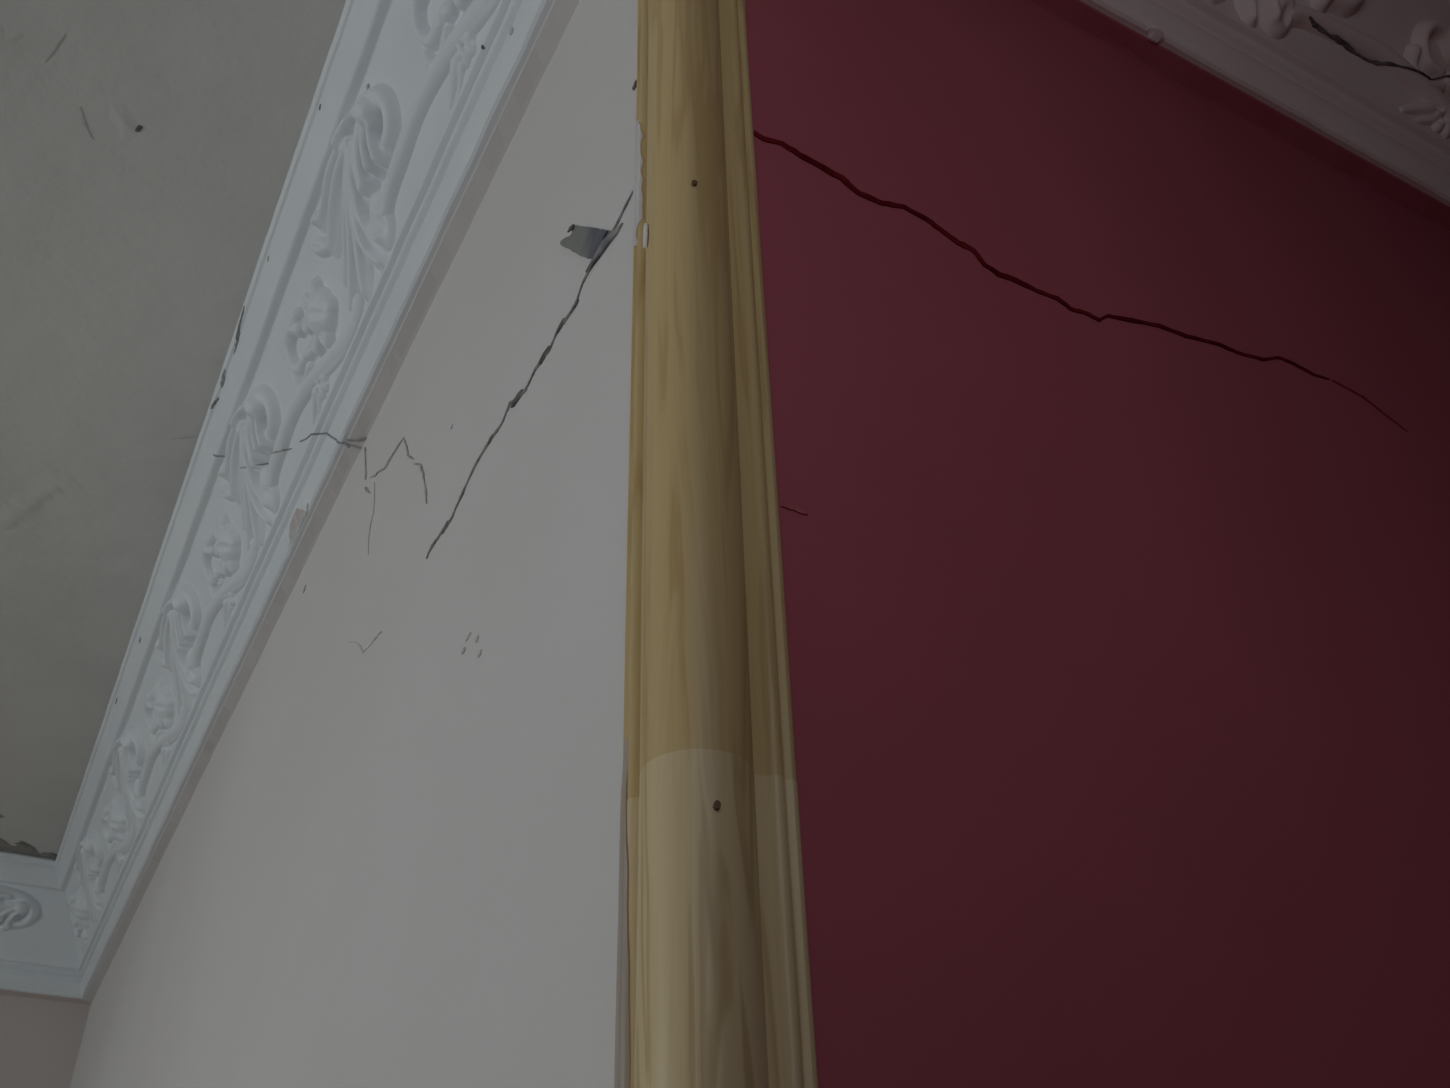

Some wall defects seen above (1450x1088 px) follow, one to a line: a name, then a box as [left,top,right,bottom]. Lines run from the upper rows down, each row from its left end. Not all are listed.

crack [1309,16,1450,80]
crack [172,190,633,559]
crack [754,130,1408,432]